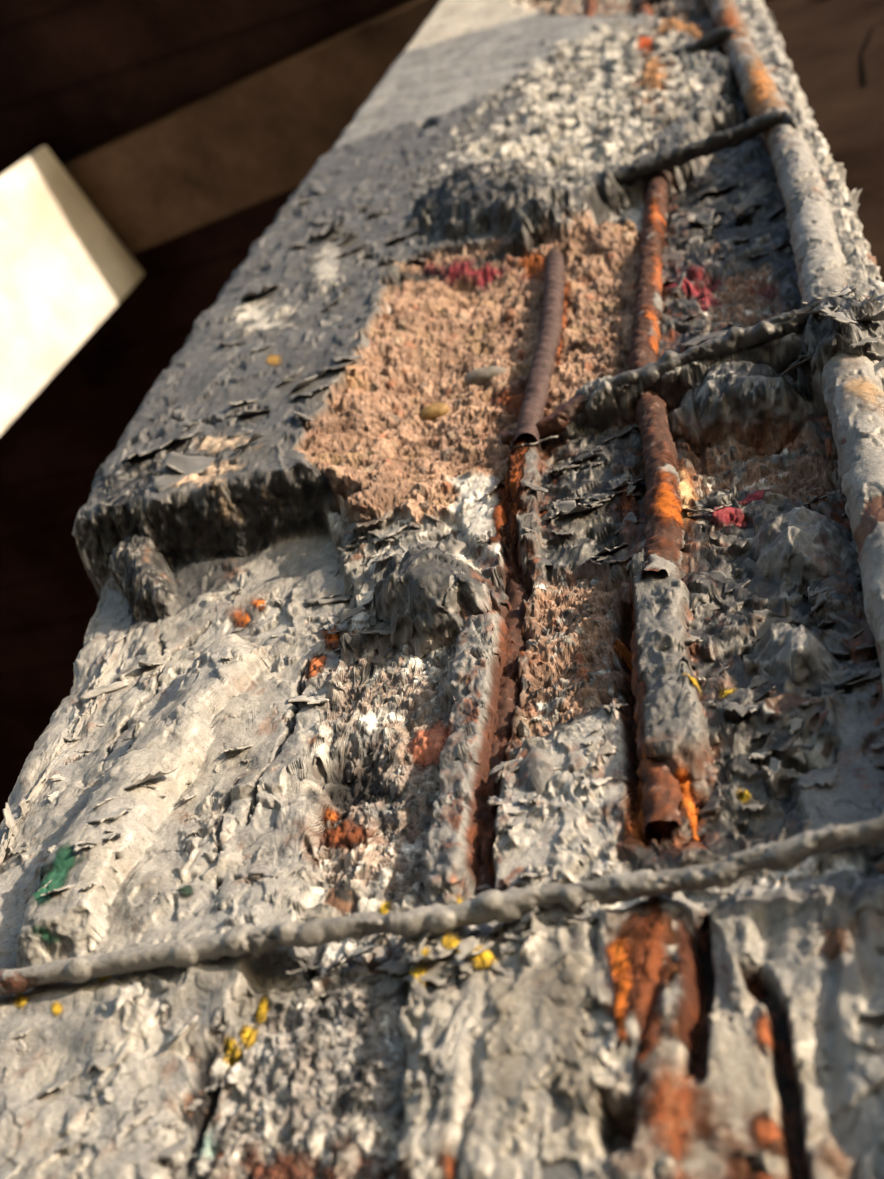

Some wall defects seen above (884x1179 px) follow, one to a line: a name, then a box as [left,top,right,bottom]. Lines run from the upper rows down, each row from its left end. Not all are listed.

spalling [417,117,437,130]
spalling [438,0,716,191]
rust [642,197,666,358]
peeling [661,163,802,347]
peeling [834,162,864,239]
peeling [0,168,645,936]
rust [489,380,533,547]
rust [619,452,698,527]
peeling [667,421,884,848]
rust [627,767,701,846]
rust [607,909,706,1092]
rust [755,1011,779,1057]